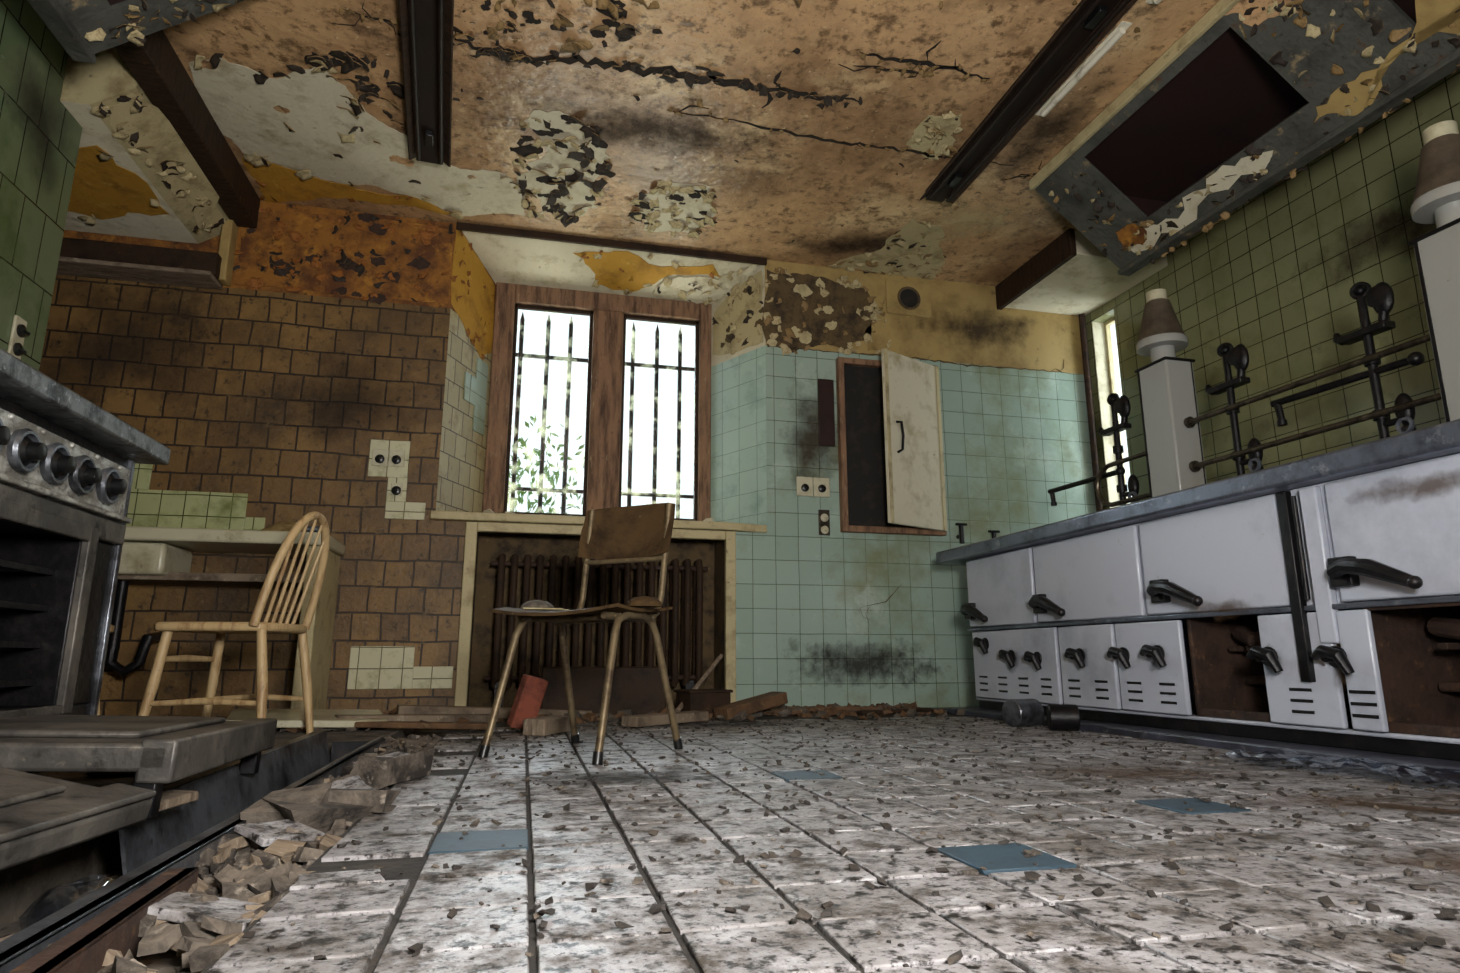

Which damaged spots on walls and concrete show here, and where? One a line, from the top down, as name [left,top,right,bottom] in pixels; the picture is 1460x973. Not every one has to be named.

peeling [462,0,663,53]
crack [453,26,990,159]
peeling [1225,0,1460,143]
peeling [68,93,224,235]
peeling [189,50,616,436]
peeling [627,168,718,240]
flaking render [574,217,946,356]
peeling [1048,143,1308,264]
water stain [814,648,931,681]
spalling [147,892,262,932]
spalling [234,819,325,847]
spalling [289,868,385,891]